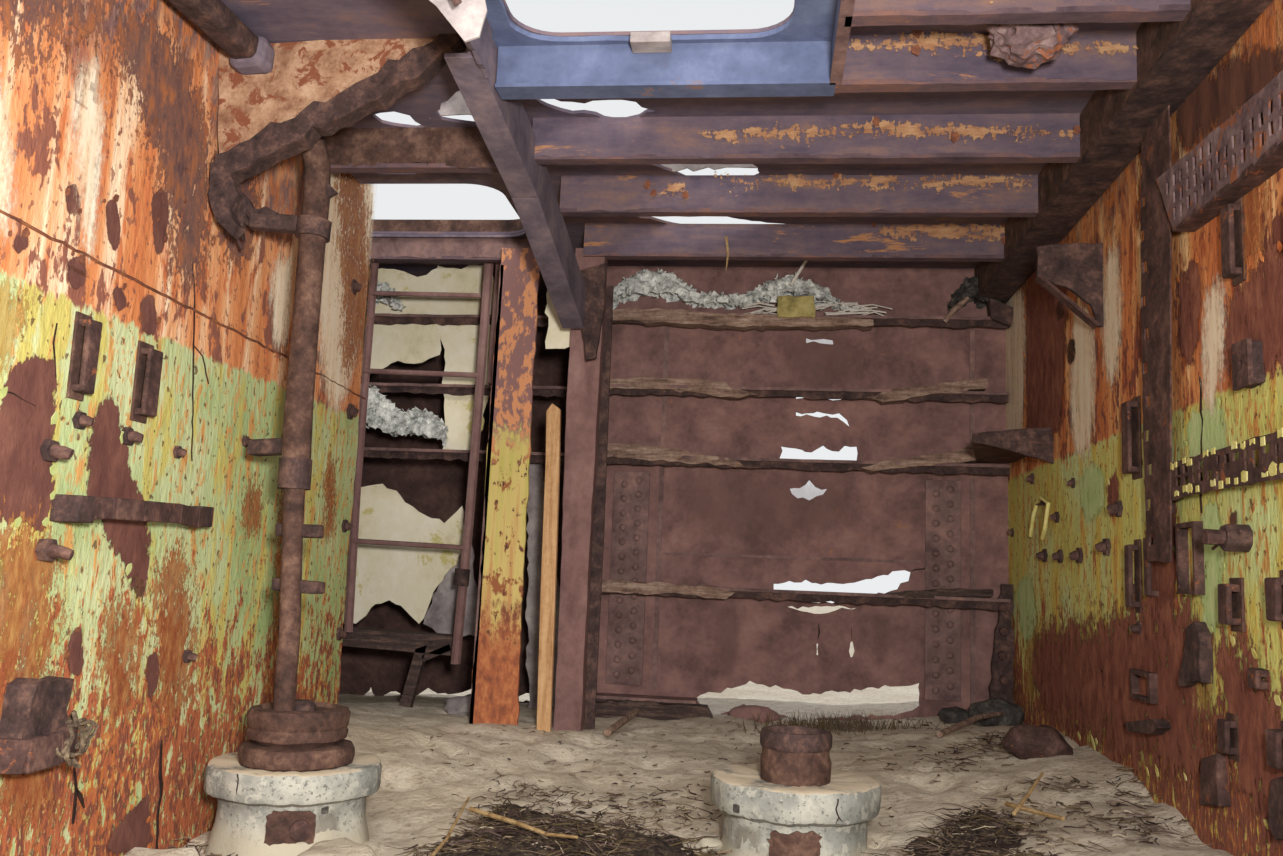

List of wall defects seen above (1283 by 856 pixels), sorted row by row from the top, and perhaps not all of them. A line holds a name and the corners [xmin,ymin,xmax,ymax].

rust [0,0,257,314]
rust [0,273,38,376]
rust [113,283,161,336]
rust [1067,339,1075,365]
peeling [0,353,58,532]
peeling [86,395,144,500]
rust [323,450,339,548]
peeling [101,519,155,600]
rust [237,473,284,651]
rust [0,496,206,741]
rust [0,763,69,856]